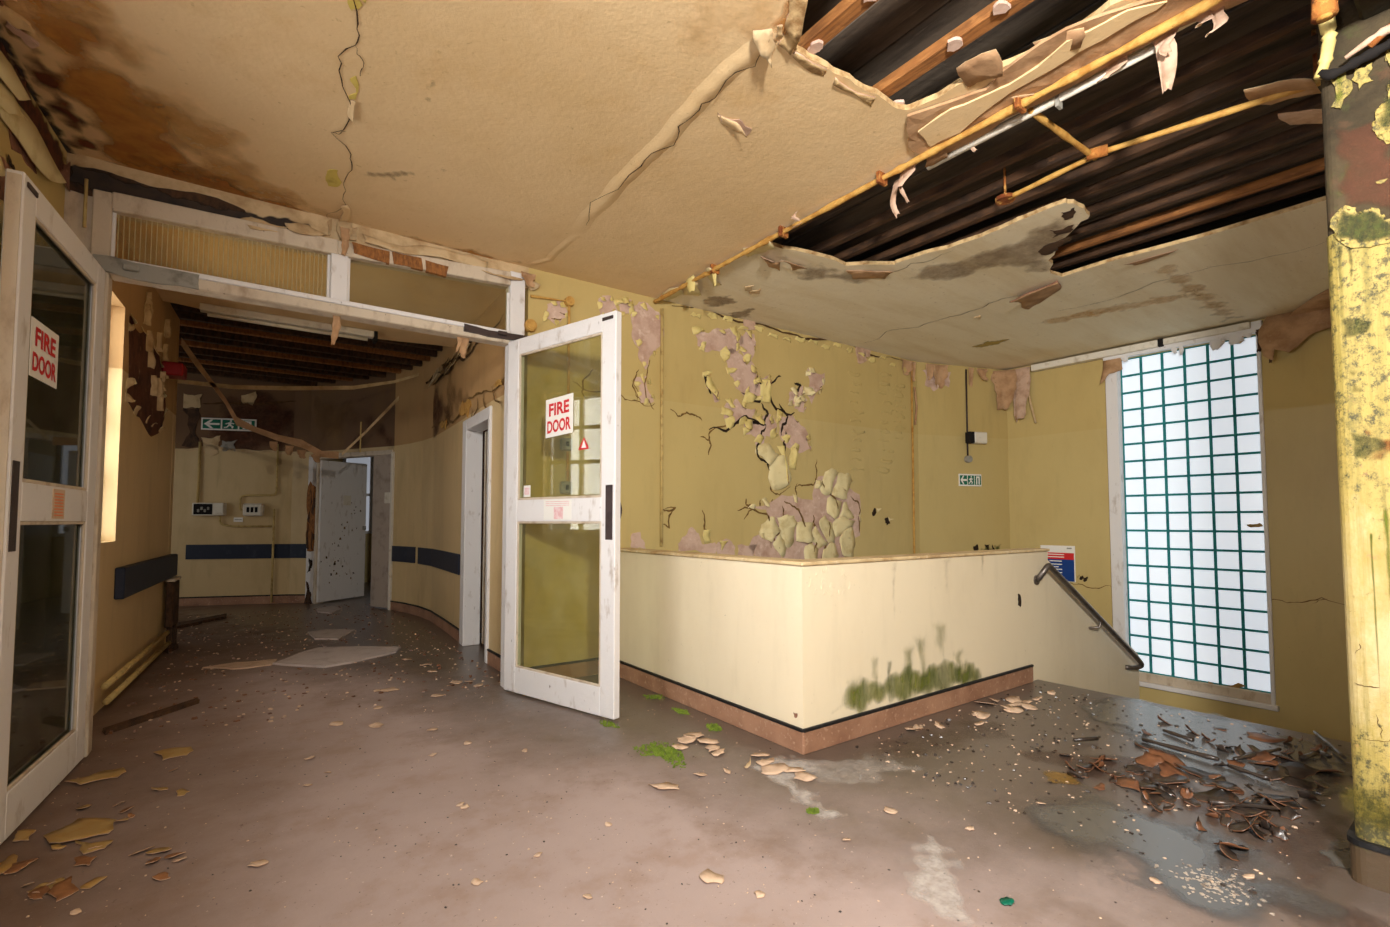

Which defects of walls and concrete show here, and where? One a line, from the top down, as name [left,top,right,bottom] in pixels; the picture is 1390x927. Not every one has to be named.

peeling [0,79,37,245]
water stain [0,0,310,229]
peeling [60,162,540,291]
crack [325,0,367,222]
spalling [753,0,876,106]
spalling [929,208,1076,276]
peeling [890,0,1248,218]
peeling [1330,49,1390,248]
peeling [125,292,296,456]
peeling [597,267,902,559]
water stain [1346,319,1369,335]
water stain [1356,436,1385,456]